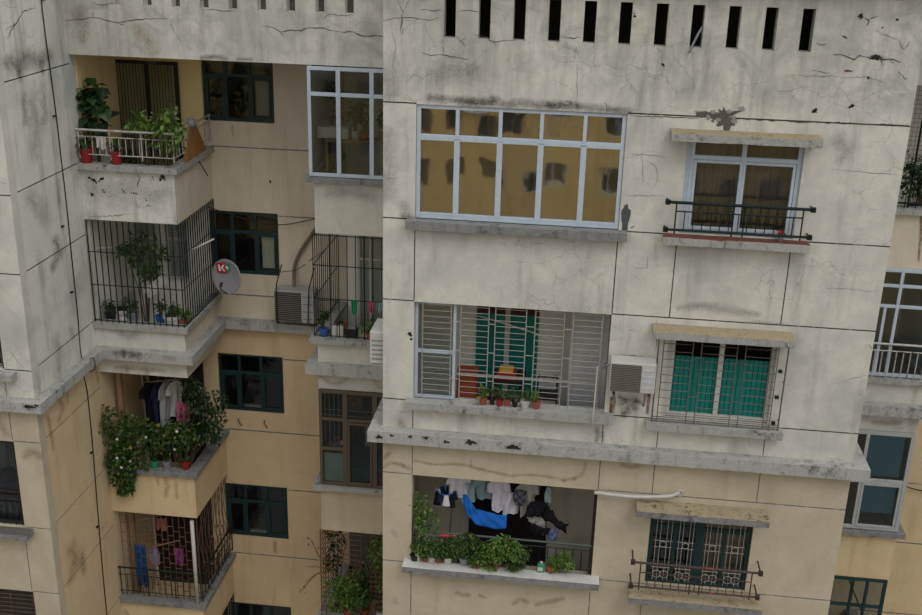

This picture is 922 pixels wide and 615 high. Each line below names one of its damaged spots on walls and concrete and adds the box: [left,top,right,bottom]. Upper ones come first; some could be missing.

crack [66,0,184,49]
crack [260,0,511,79]
spalling [695,106,745,131]